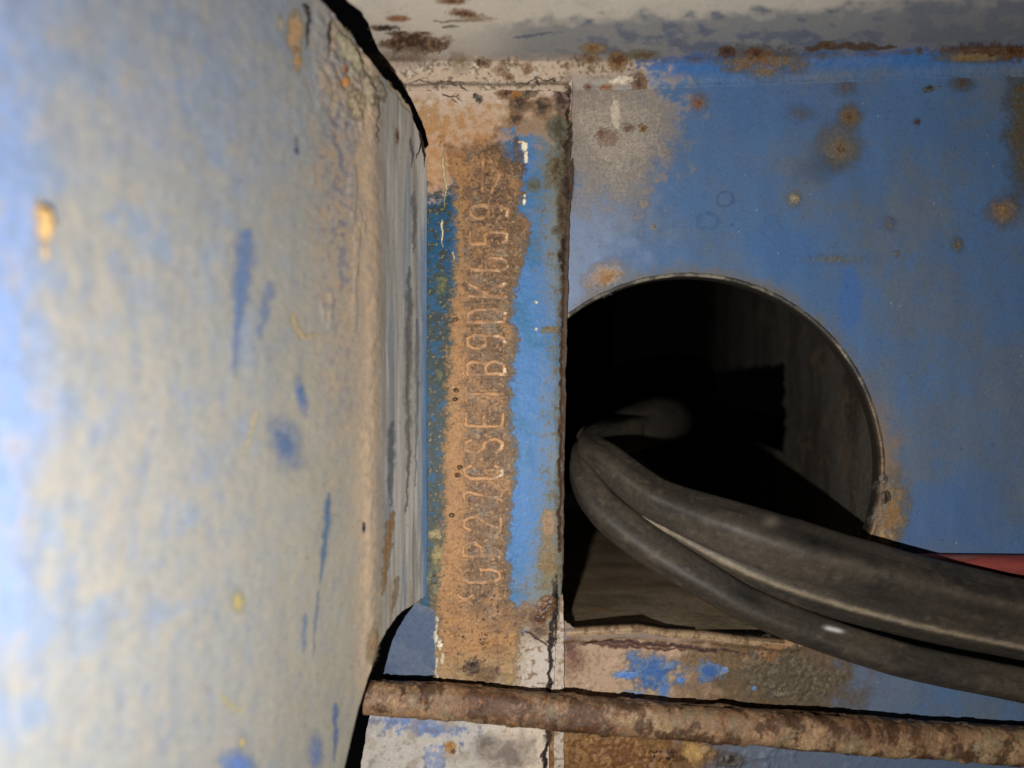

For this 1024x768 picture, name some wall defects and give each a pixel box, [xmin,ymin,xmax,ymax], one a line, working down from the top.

corrosion [369,15,450,65]
corrosion [720,41,897,79]
corrosion [939,43,1024,63]
peeling [571,73,670,201]
corrosion [363,59,1024,768]
spalling [759,640,795,651]
peeling [612,650,729,699]